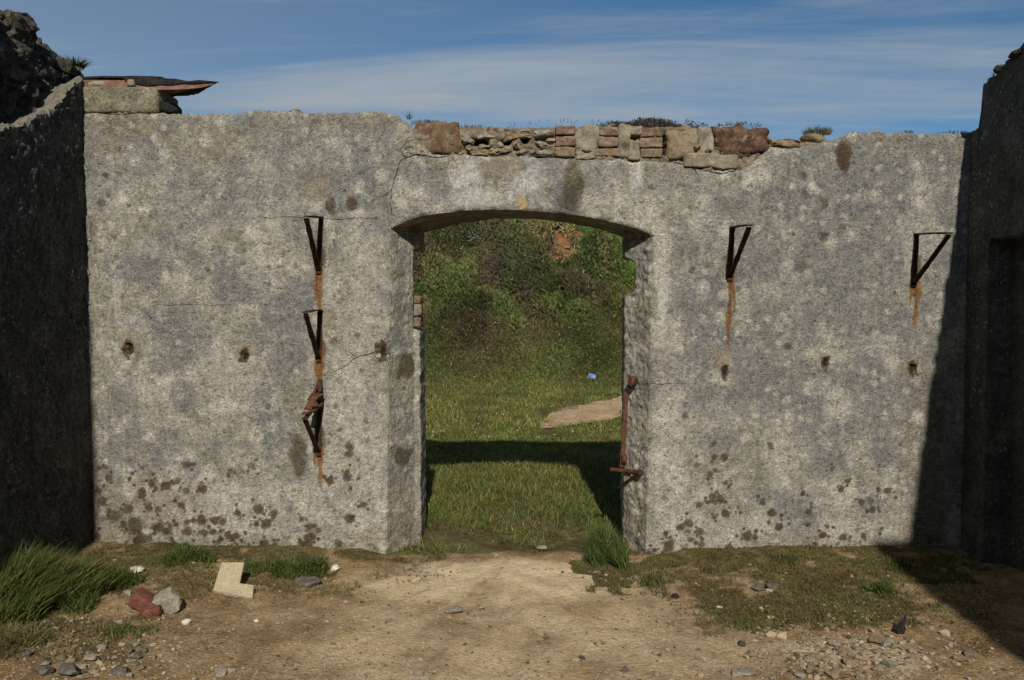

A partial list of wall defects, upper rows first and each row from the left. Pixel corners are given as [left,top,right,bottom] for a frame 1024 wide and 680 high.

crack [328,139,449,227]
leakage [835,142,853,172]